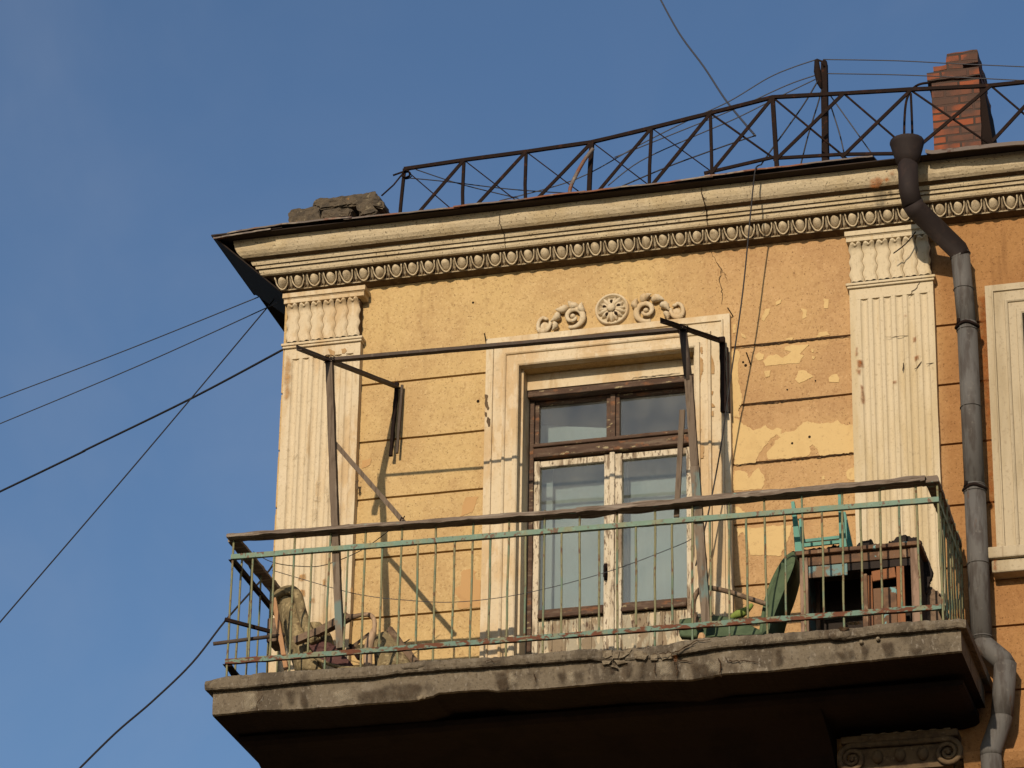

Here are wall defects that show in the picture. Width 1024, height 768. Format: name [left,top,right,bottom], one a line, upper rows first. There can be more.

peeling [731,331,854,491]
spalling [602,648,673,670]